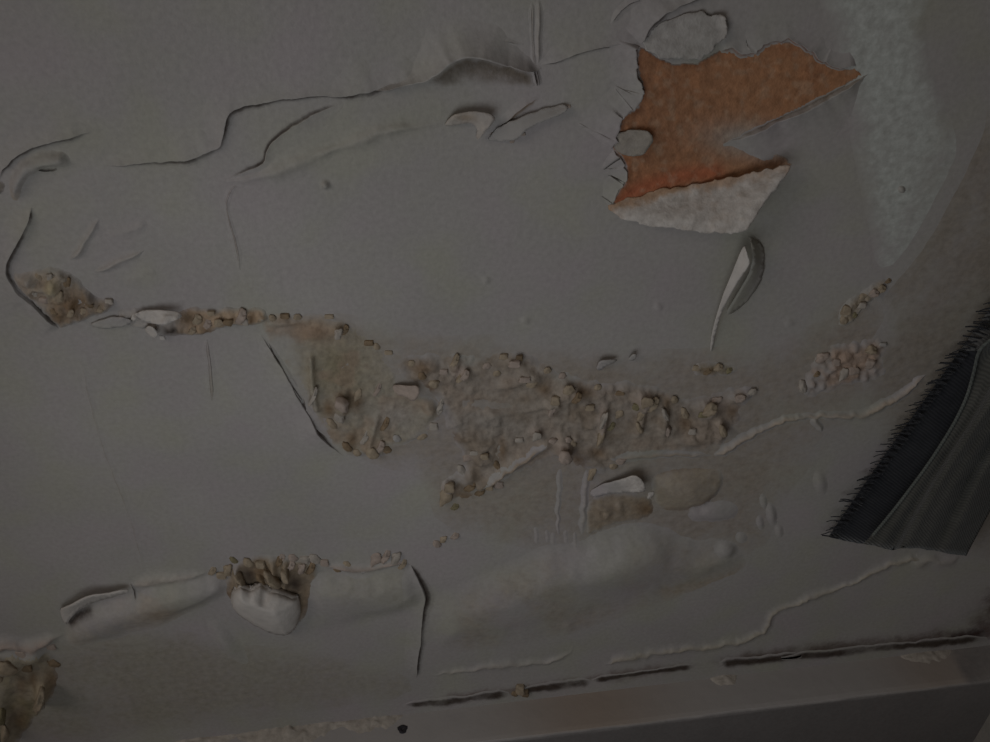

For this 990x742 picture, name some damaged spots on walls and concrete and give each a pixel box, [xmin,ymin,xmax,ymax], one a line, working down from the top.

peeling [0,11,868,536]
flaking render [0,631,63,742]
crack [400,565,694,708]
crack [719,635,988,669]